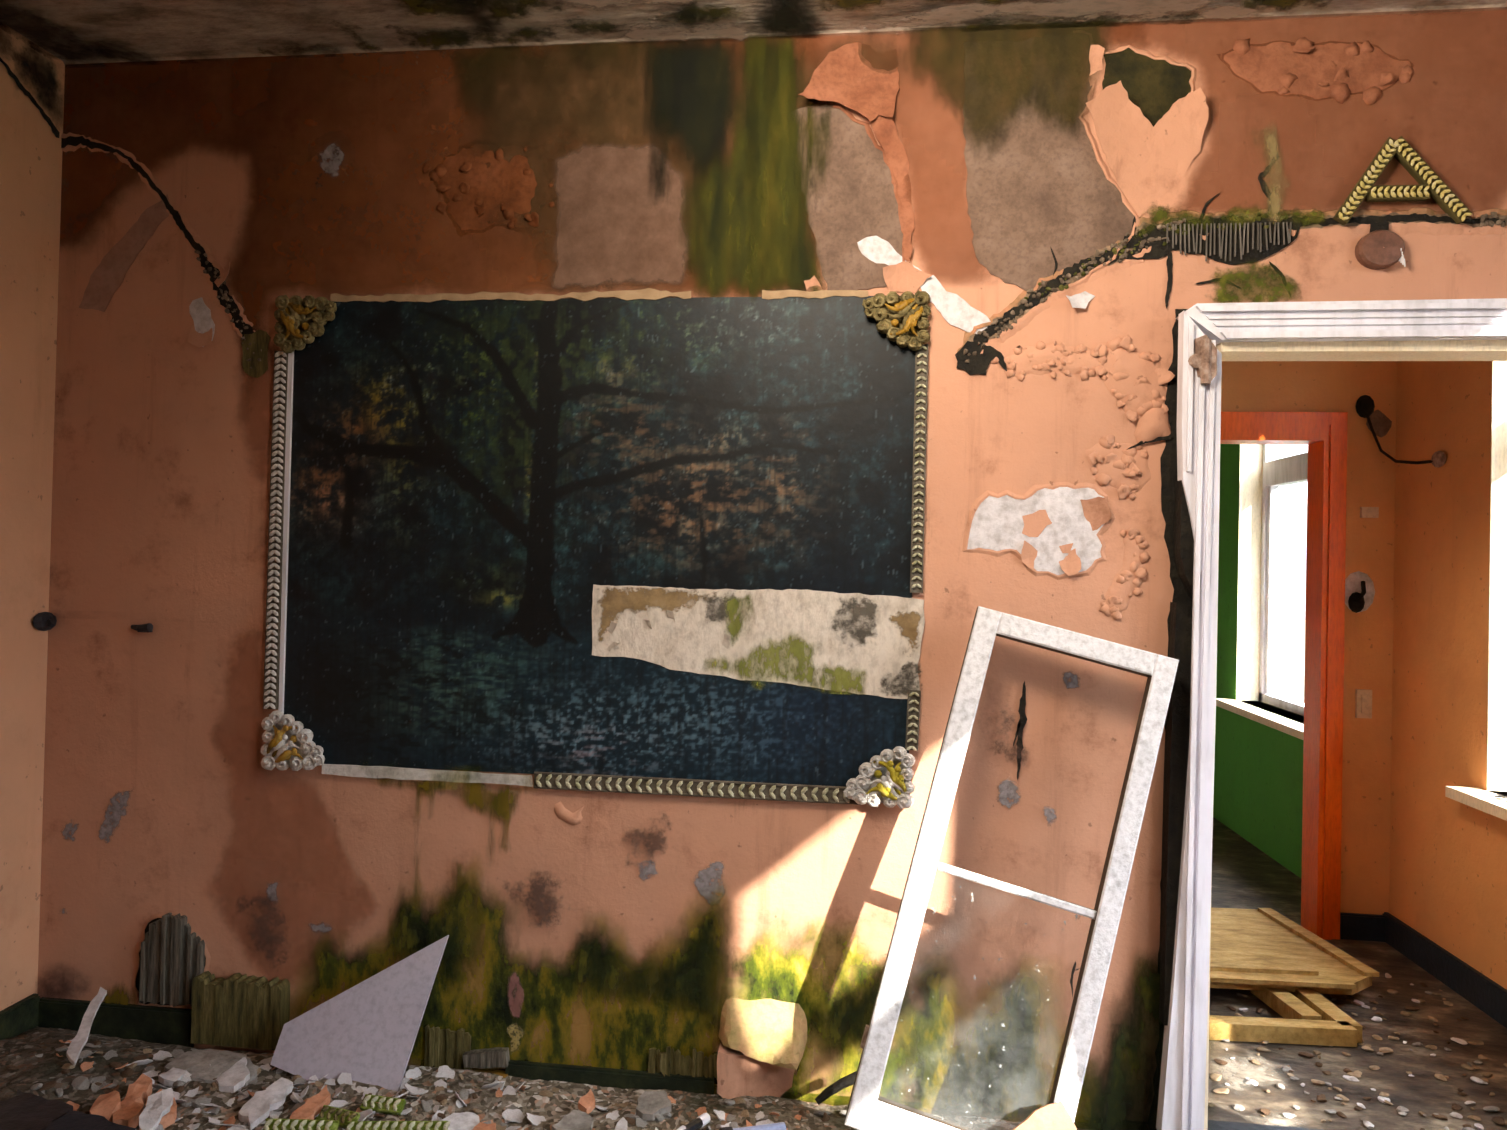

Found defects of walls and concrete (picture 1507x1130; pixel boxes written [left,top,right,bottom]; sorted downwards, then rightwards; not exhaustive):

crack [0,57,271,378]
water stain [60,0,1507,331]
spalling [794,0,1269,334]
crack [955,155,1507,375]
spalling [962,482,1116,580]
crack [1126,435,1173,450]
crack [1013,681,1027,780]
mould [506,872,559,926]